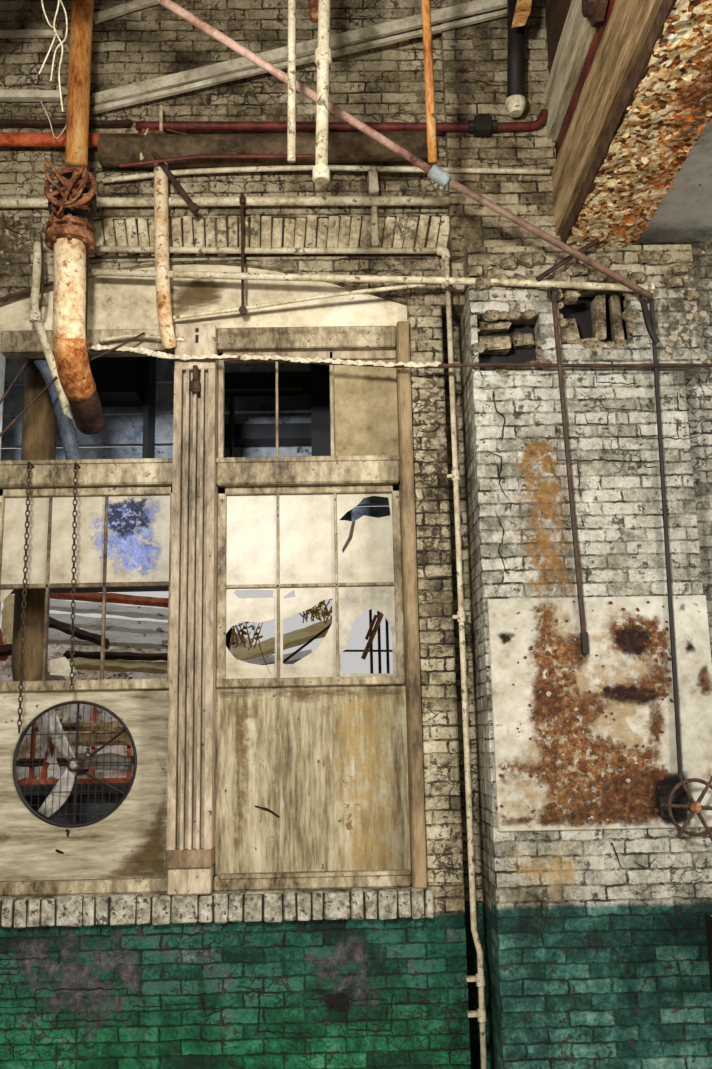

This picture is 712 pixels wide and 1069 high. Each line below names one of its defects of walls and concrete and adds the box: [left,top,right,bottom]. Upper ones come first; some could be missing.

spalling [467,57,712,364]
spalling [469,309,552,375]
rust [495,601,674,827]